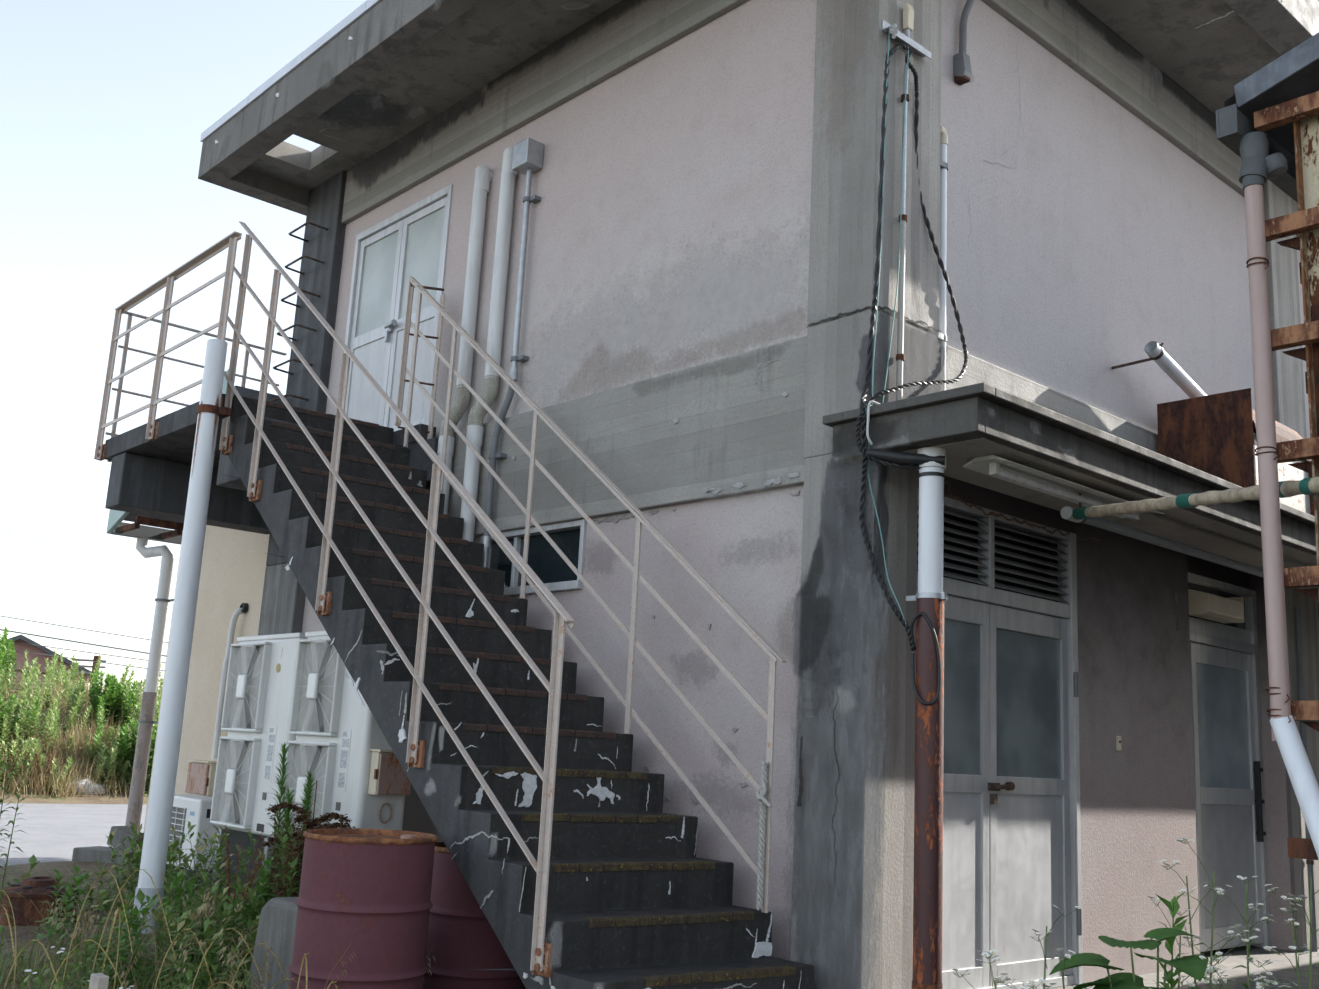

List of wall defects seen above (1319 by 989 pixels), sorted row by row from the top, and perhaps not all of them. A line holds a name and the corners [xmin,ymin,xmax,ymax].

water stain [319,0,640,189]
water stain [856,310,945,406]
water stain [787,423,892,989]
peeling [473,771,537,807]
peeling [574,777,621,807]
crack [832,687,840,897]
peeling [523,972,556,989]
peeling [746,912,772,958]